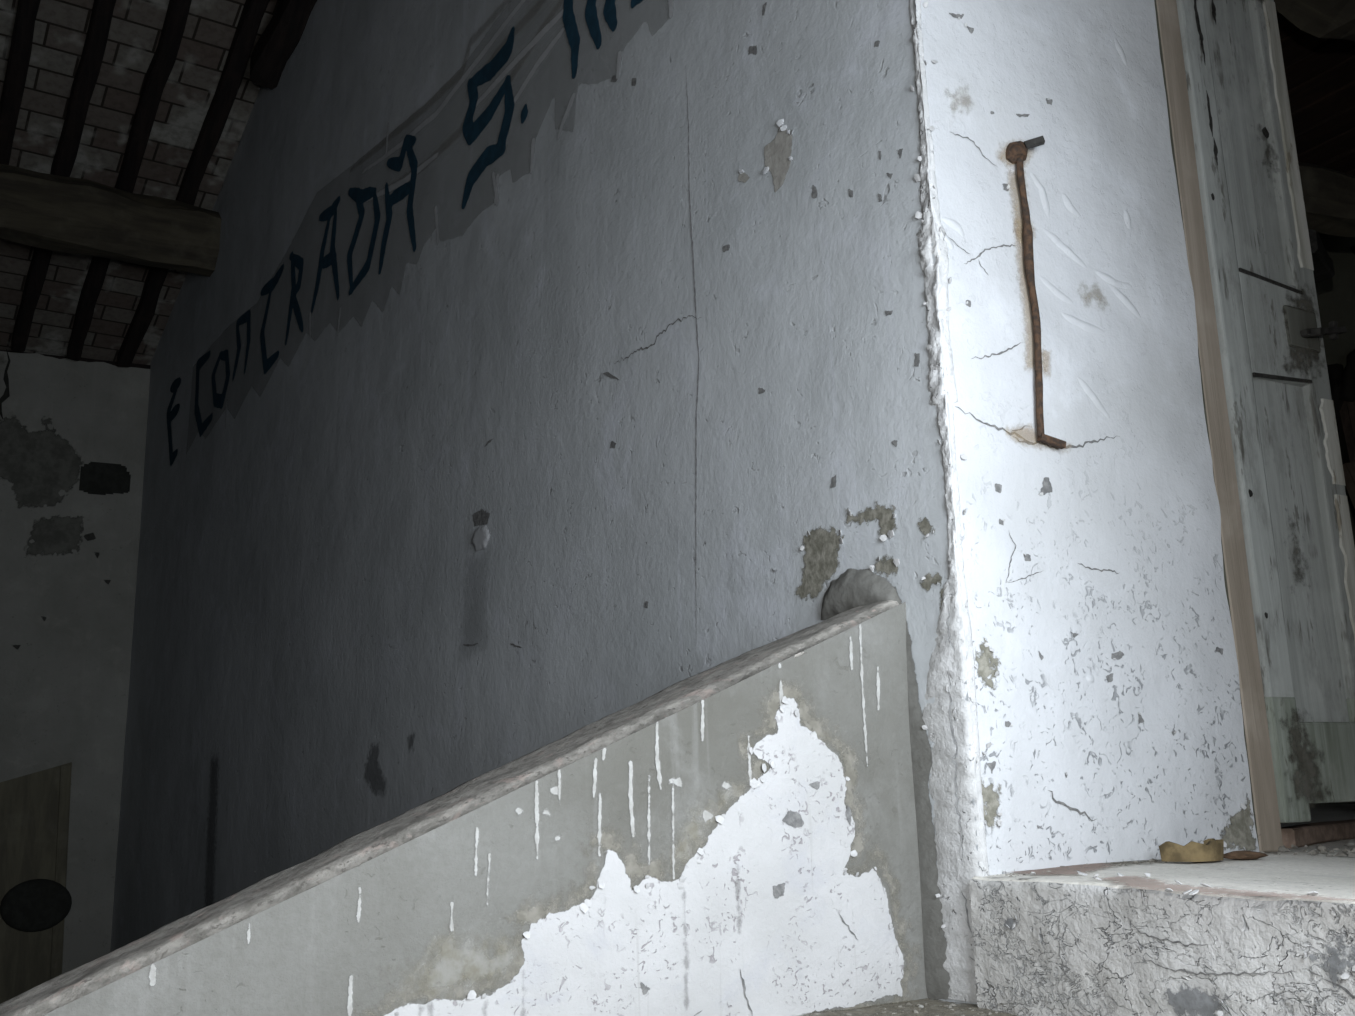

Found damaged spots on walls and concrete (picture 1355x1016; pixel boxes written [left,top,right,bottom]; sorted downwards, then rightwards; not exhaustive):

peeling [738,119,793,192]
crack [0,349,10,419]
spalling [0,417,99,558]
spalling [796,502,900,601]
spalling [918,517,935,537]
peeling [365,683,917,1016]